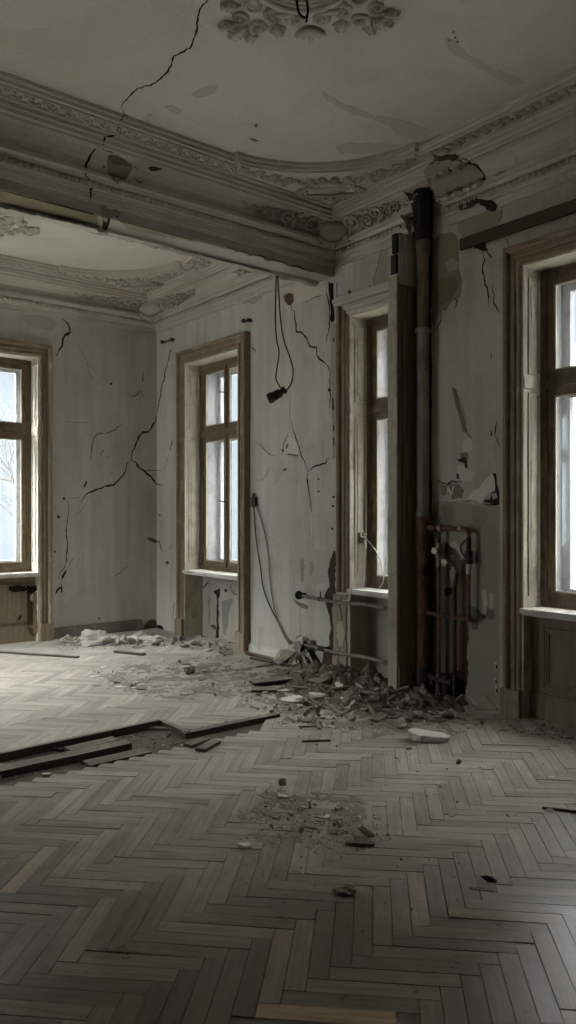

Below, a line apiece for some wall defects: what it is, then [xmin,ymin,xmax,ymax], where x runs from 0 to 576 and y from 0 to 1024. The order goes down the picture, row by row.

crack [46,0,208,218]
flaking render [108,155,132,184]
flaking render [424,154,498,212]
crack [482,206,509,312]
crack [56,319,103,385]
crack [55,350,172,594]
crack [256,402,330,543]
flaking render [322,551,347,667]
peeling [433,438,500,706]